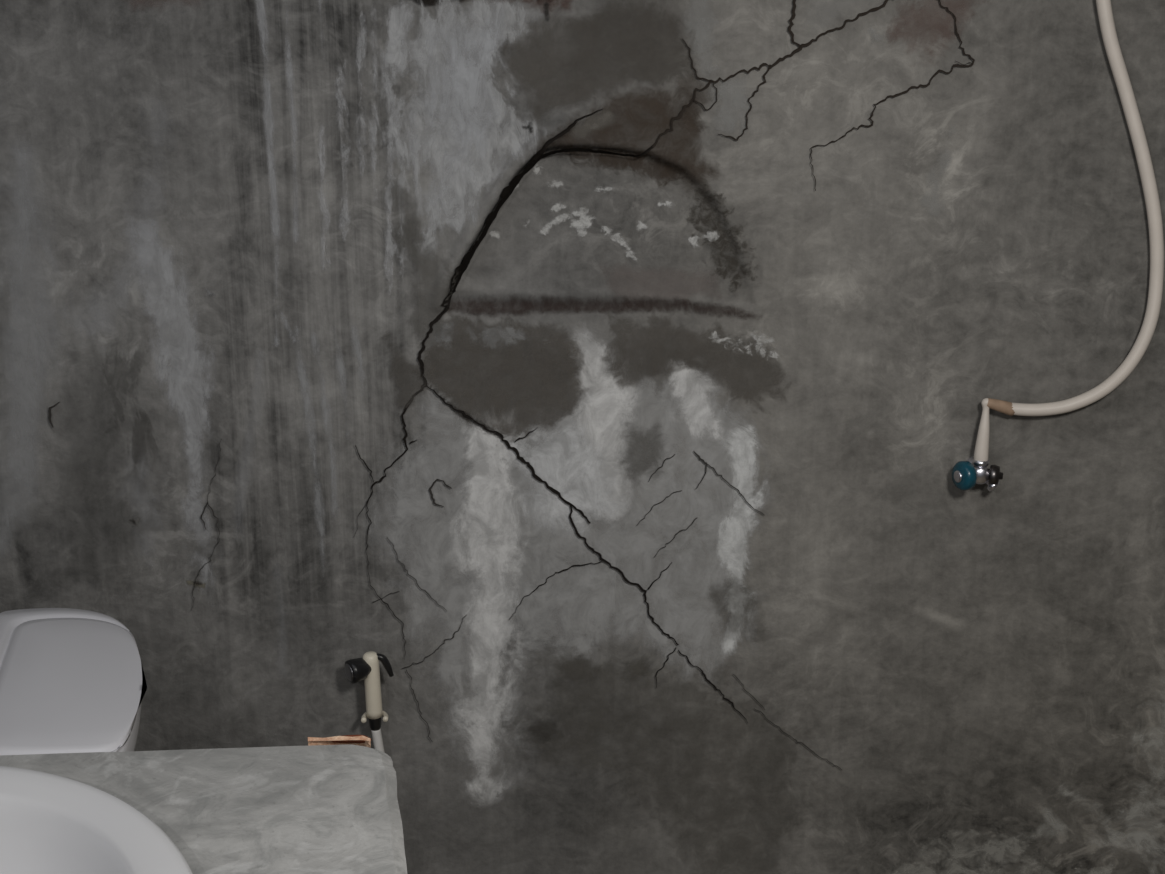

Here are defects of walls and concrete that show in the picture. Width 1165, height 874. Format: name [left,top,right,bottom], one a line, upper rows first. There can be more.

leakage [257,0,265,48]
leakage [266,84,279,235]
crack [810,0,975,191]
leakage [361,0,780,800]
crack [354,0,888,770]